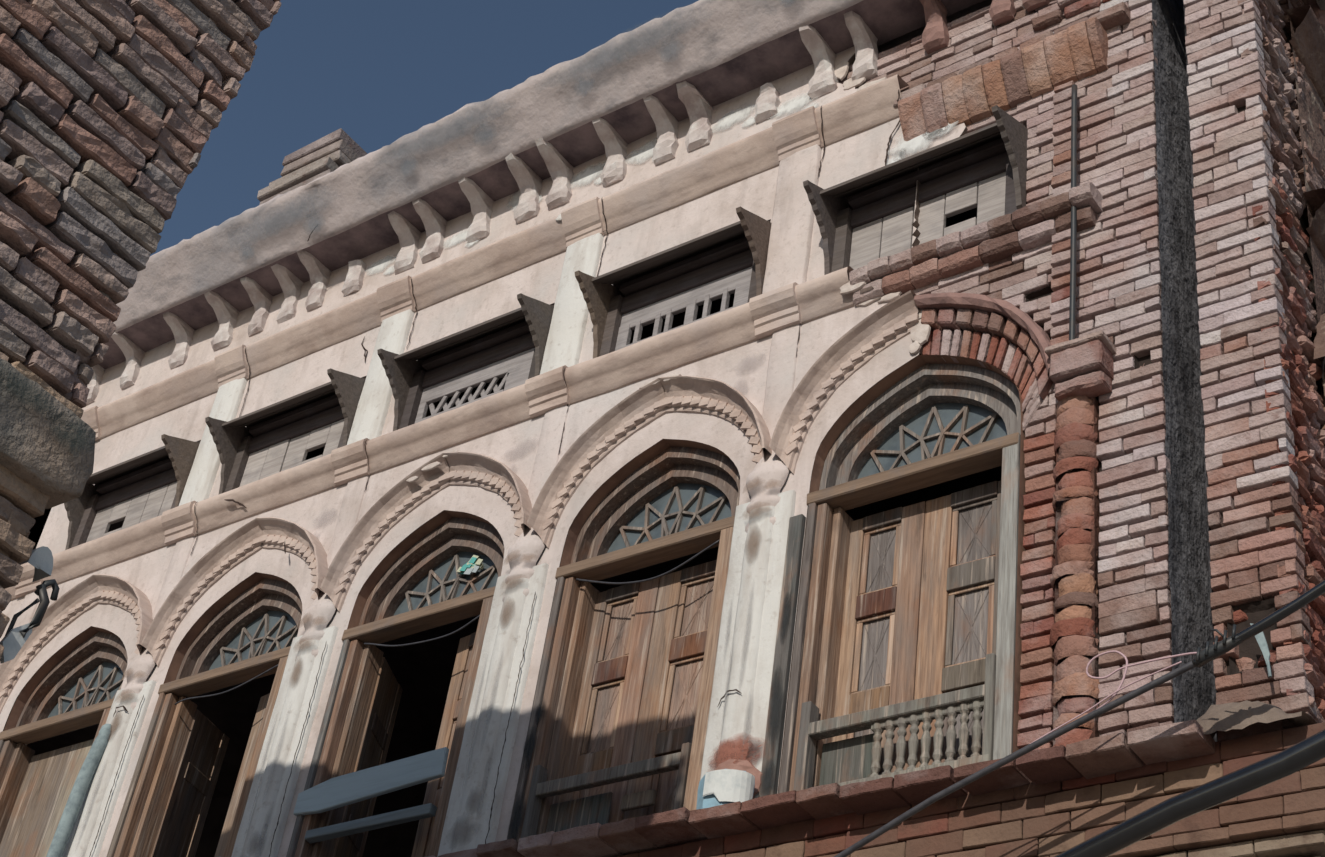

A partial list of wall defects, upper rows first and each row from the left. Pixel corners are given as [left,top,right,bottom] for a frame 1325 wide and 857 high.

crack [817,106,825,176]
leakage [509,190,520,209]
leakage [443,230,478,247]
leakage [367,257,395,274]
flaking render [834,0,1174,751]
spalling [1227,598,1277,637]
spalling [1229,646,1280,675]
flaking render [715,759,763,798]